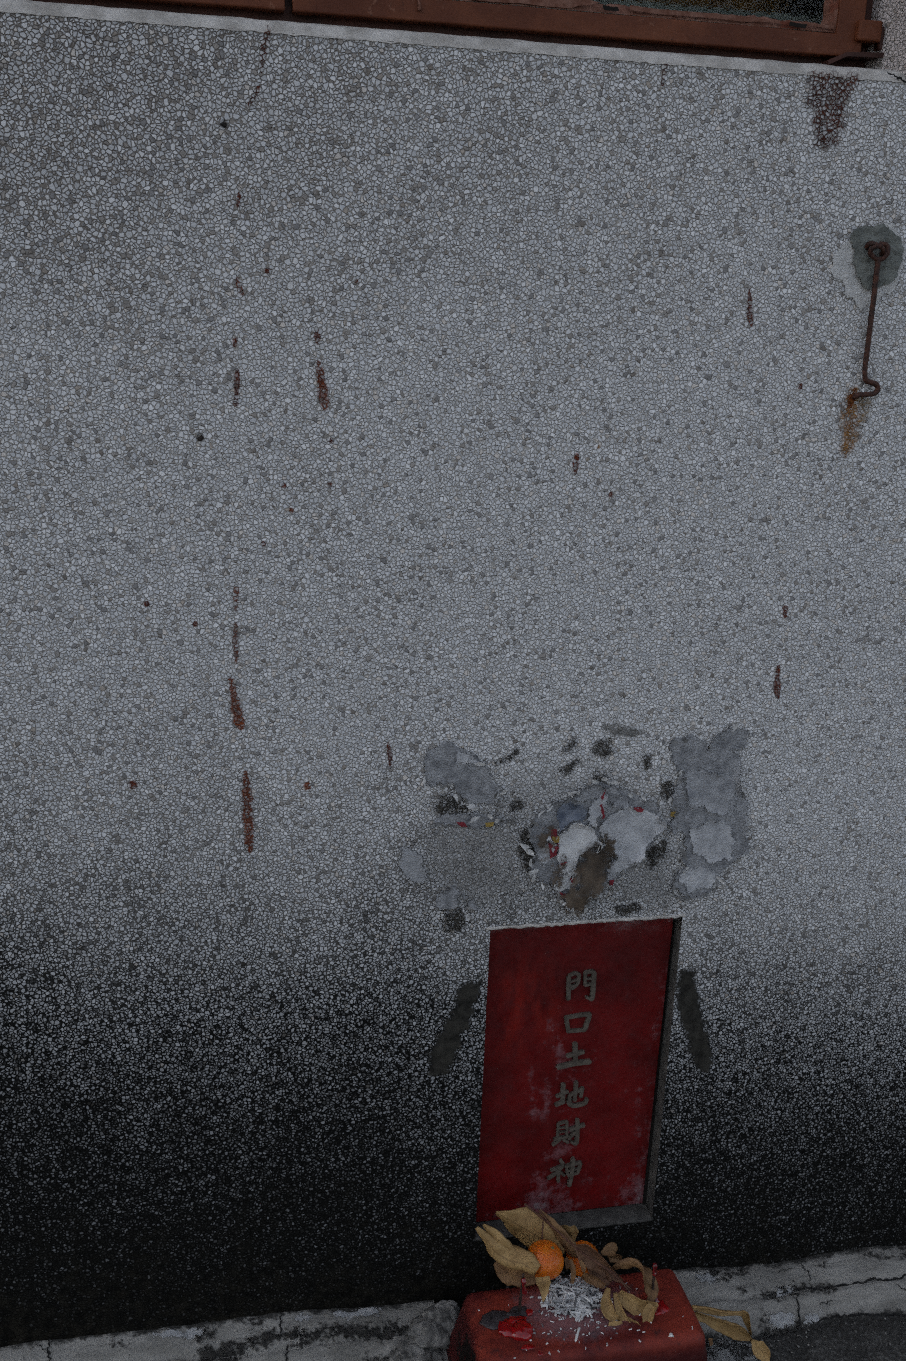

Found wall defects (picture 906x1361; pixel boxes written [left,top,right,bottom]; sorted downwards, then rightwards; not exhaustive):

corrosion [248,25,271,108]
corrosion [314,330,330,410]
corrosion [840,387,871,457]
corrosion [228,587,245,730]
corrosion [241,770,254,853]
peeling [422,724,756,921]
crack [767,1248,906,1324]
crack [34,1338,52,1361]
crack [279,1312,289,1361]